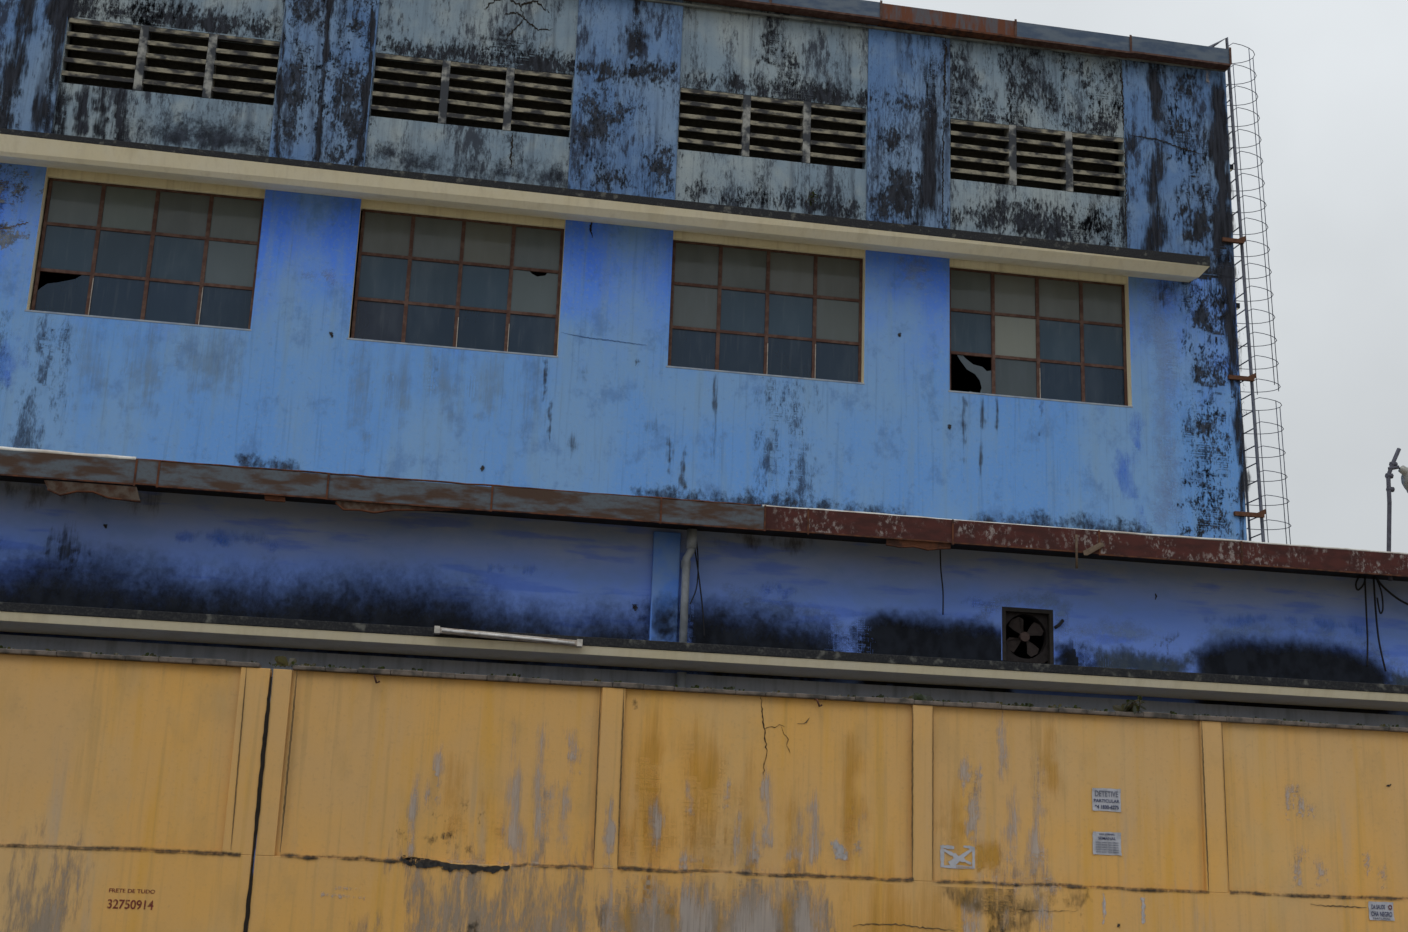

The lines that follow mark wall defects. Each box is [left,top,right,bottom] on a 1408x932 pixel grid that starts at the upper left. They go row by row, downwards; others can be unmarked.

crack [486,0,551,40]
leakage [0,0,1251,540]
corrosion [0,474,807,534]
leakage [0,531,1008,662]
leakage [170,641,555,666]
leakage [577,664,657,672]
leakage [682,670,829,682]
leakage [859,681,1013,693]
crack [760,697,809,775]
crack [231,667,297,932]